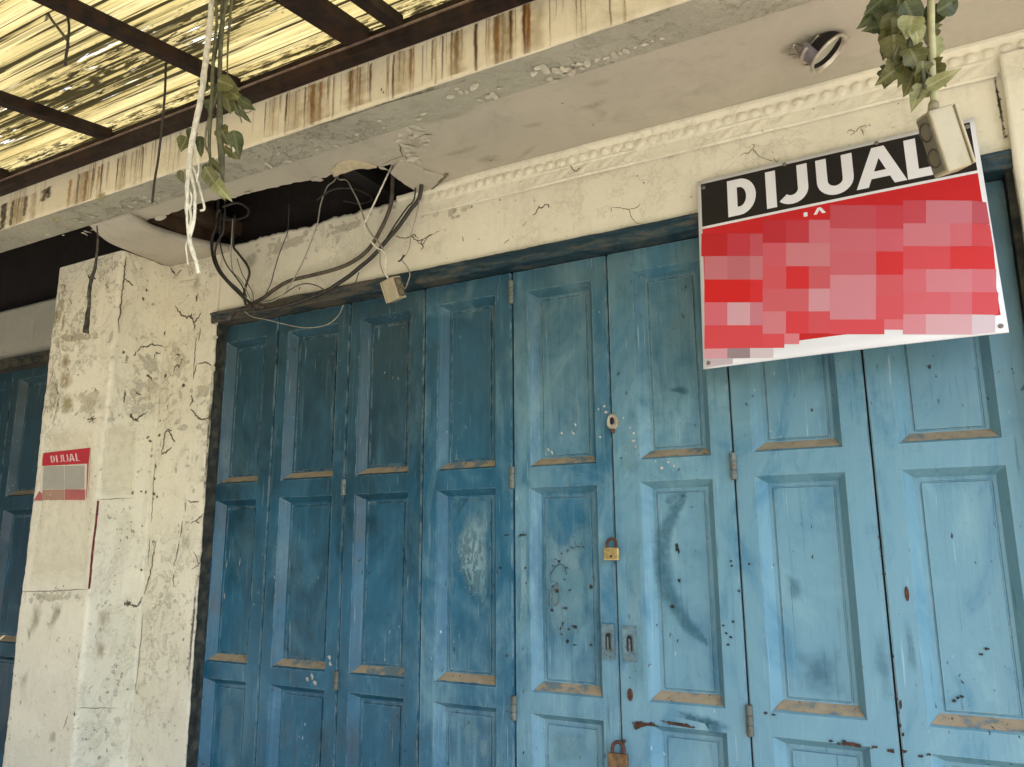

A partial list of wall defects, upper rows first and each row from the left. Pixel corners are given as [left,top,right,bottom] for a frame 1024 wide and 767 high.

rust [304,76,335,112]
rust [349,63,372,97]
rust [392,49,412,91]
rust [431,31,458,65]
rust [474,3,530,59]
peeling [530,37,665,83]
rust [68,162,103,195]
rust [0,188,27,230]
crack [397,231,463,251]
crack [118,251,216,422]
crack [97,429,203,687]